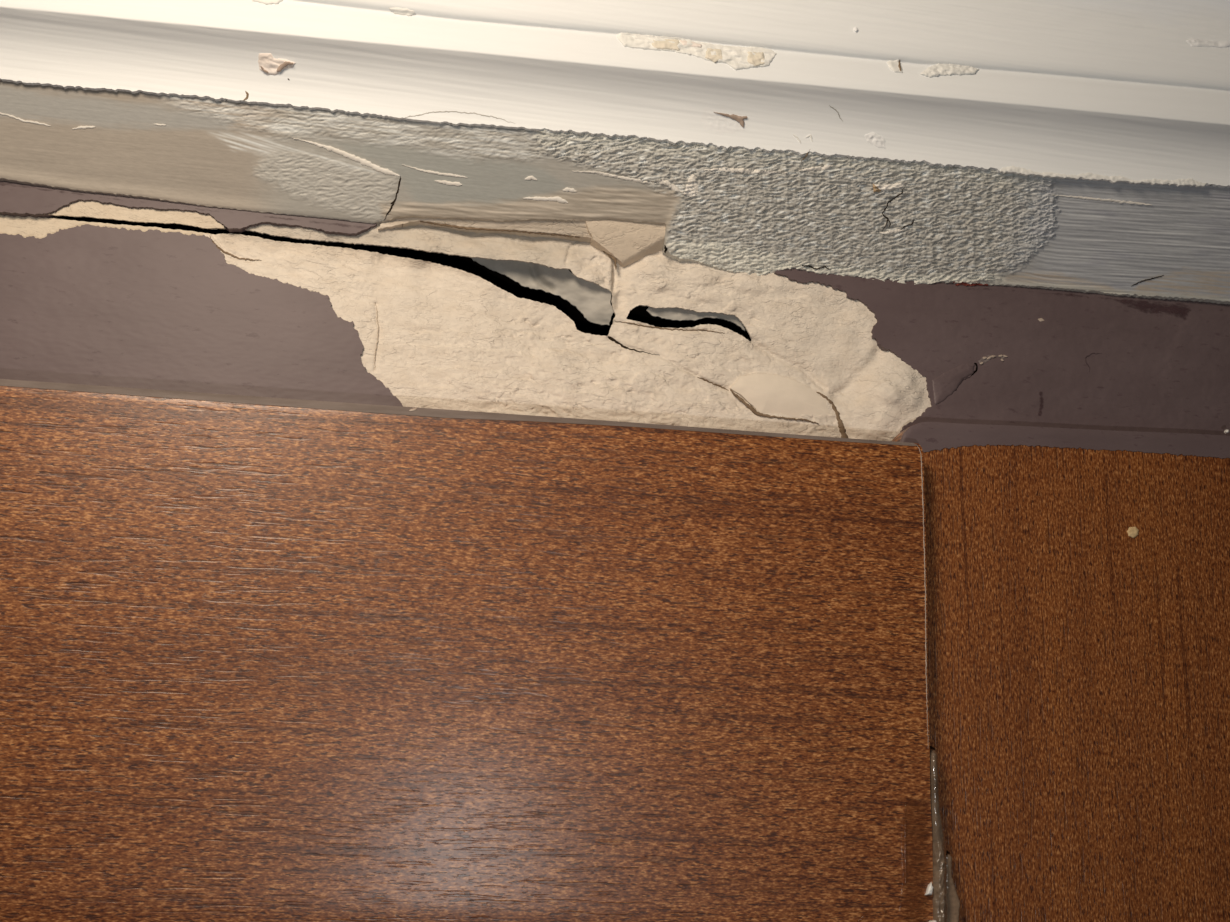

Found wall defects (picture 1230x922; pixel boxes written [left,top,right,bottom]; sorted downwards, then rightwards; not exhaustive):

peeling [616,32,777,70]
peeling [684,174,698,198]
peeling [873,183,905,192]
crack [372,302,380,367]
spalling [0,201,931,441]
crack [698,377,848,438]
spalling [918,447,928,735]